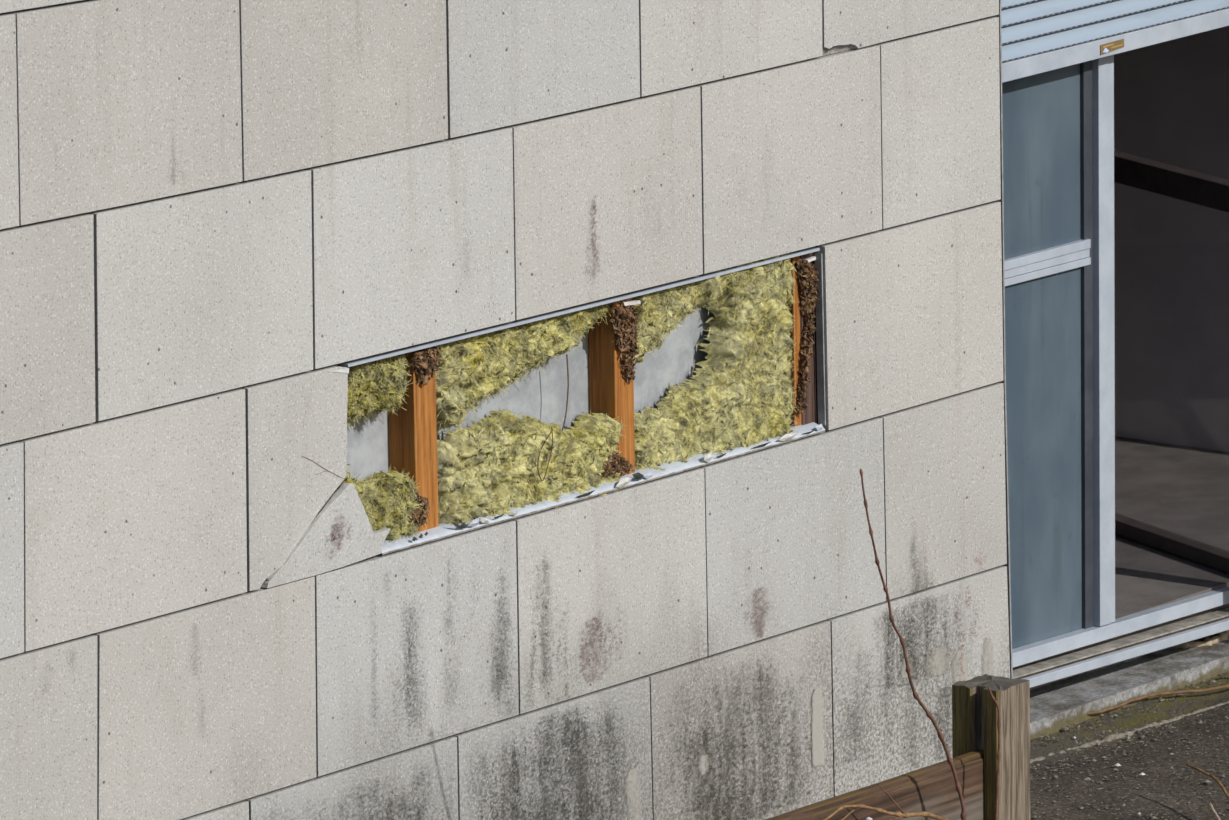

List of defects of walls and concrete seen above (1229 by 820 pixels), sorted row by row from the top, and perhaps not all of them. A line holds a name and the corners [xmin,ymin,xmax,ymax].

crack [303,456,345,517]
water stain [884,618,994,707]
water stain [538,721,593,820]
water stain [606,728,641,820]
water stain [695,734,712,777]
water stain [812,688,824,767]